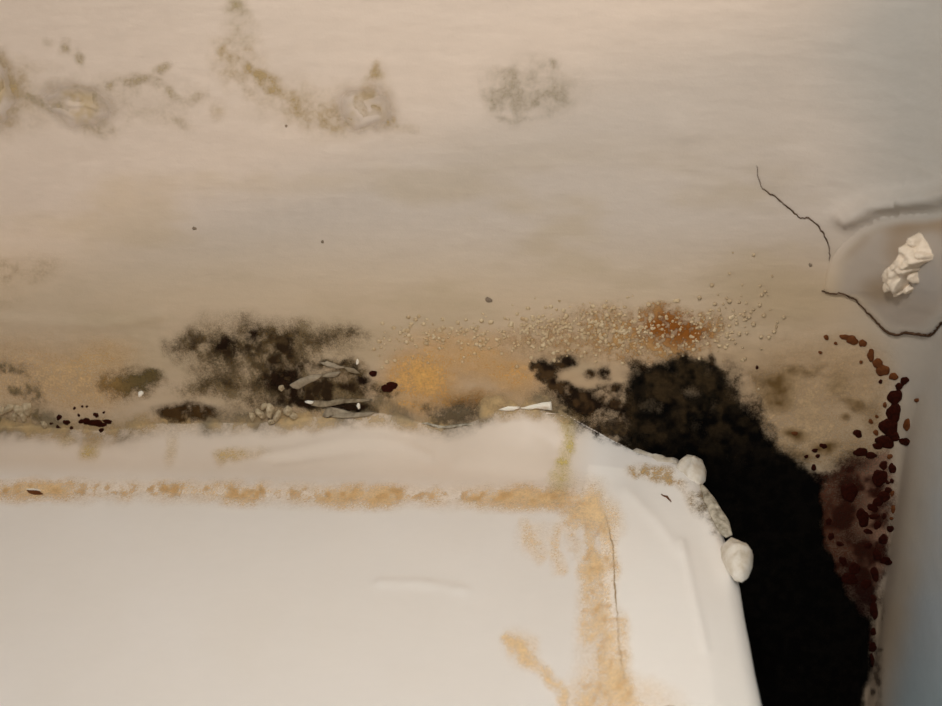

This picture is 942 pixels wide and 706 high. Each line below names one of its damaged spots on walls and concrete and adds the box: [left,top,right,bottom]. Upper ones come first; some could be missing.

leakage [246,64,281,93]
crack [757,168,830,261]
crack [822,290,942,337]
peeling [278,359,360,391]
spalling [249,402,299,425]
peeling [305,398,377,418]
leakage [0,283,910,706]
rust [810,450,895,648]